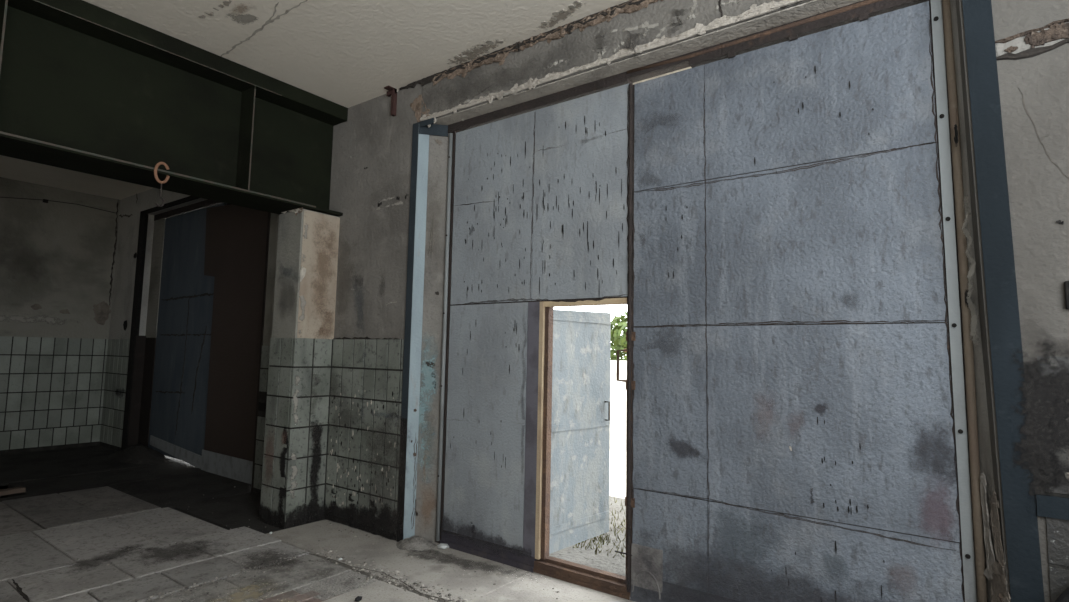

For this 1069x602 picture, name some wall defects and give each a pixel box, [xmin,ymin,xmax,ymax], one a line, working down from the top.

crack [221,0,307,57]
spalling [385,0,804,128]
flaking render [995,18,1069,60]
crack [1019,89,1069,179]